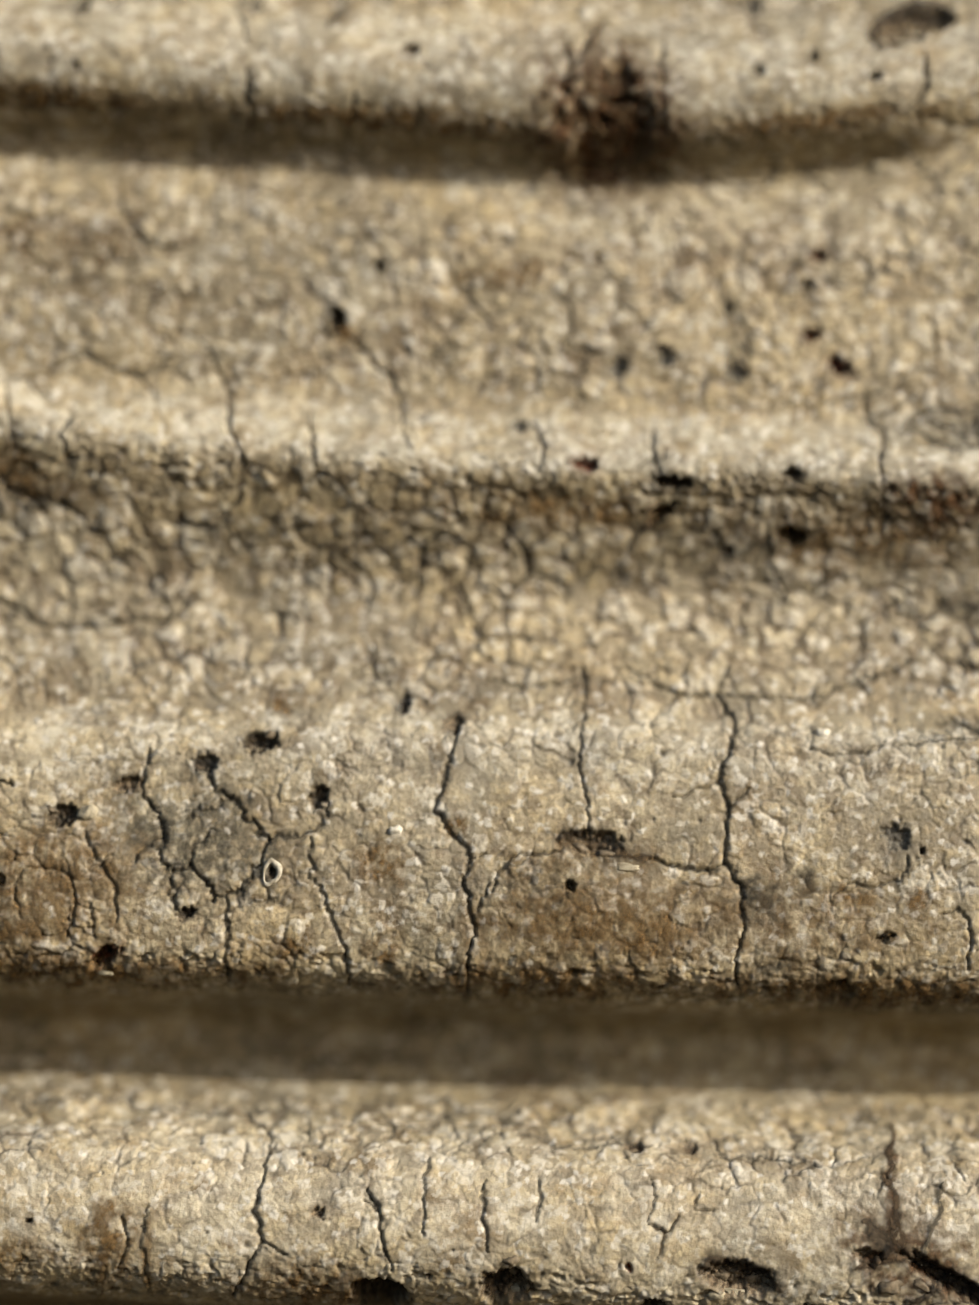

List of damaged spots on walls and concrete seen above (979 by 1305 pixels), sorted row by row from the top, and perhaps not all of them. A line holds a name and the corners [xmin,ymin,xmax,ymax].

spalling [867,0,955,48]
corrosion [528,54,682,195]
crack [0,336,199,630]
crack [498,670,588,810]
crack [13,750,350,984]
crack [433,722,560,1002]
crack [623,662,979,983]
crack [0,1091,336,1295]
crack [364,1190,392,1270]
crack [421,1160,429,1234]
crack [479,1183,488,1253]
crack [647,1183,709,1260]